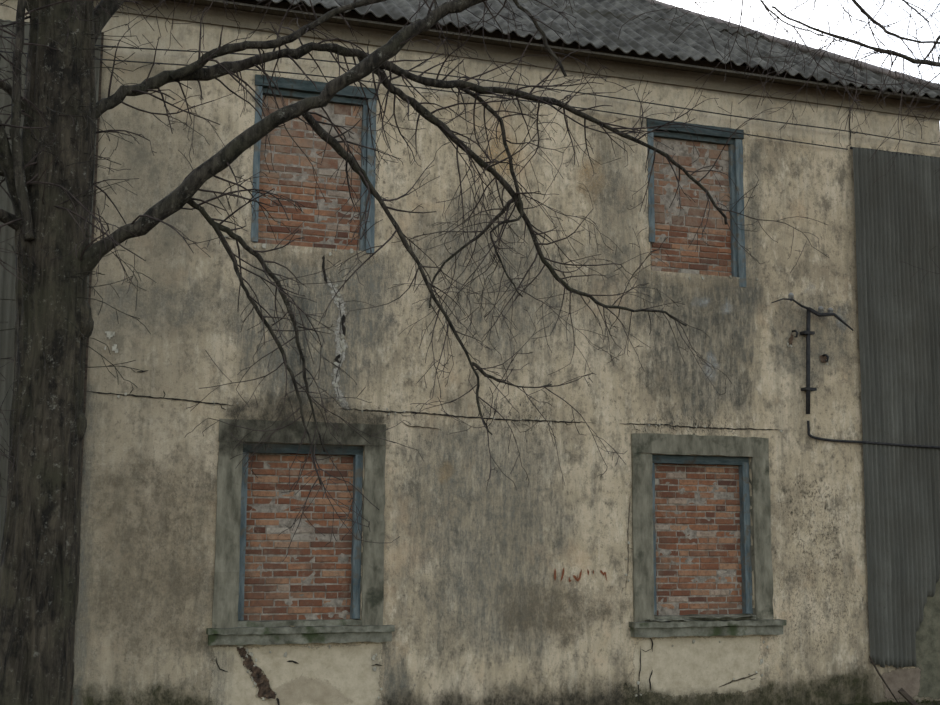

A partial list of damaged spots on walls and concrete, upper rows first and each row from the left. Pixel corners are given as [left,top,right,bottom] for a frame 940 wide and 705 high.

crack [320,256,328,283]
leakage [640,274,755,435]
leakage [418,425,610,649]
leakage [72,536,207,705]
crack [216,645,280,705]
leakage [484,673,872,705]